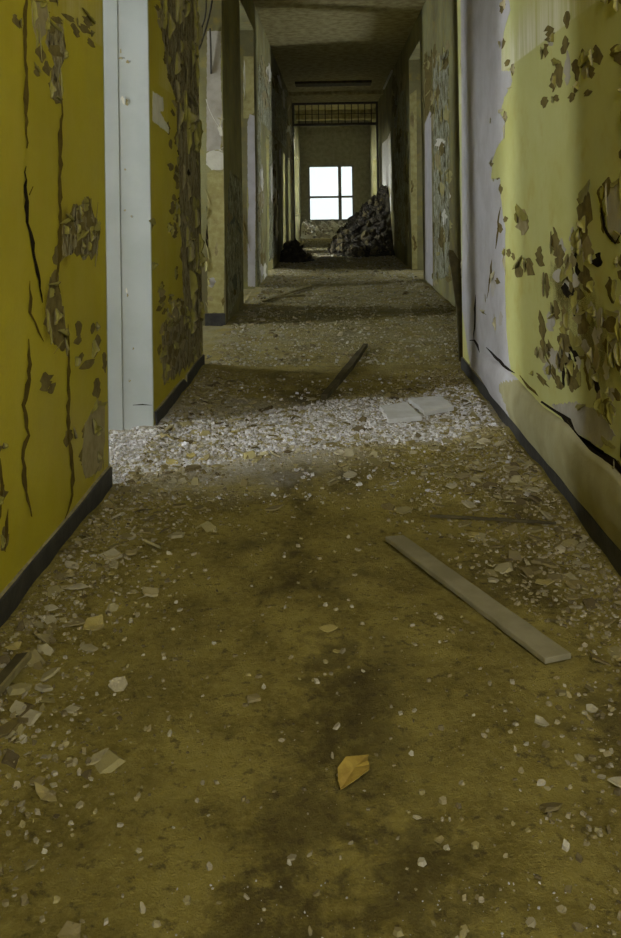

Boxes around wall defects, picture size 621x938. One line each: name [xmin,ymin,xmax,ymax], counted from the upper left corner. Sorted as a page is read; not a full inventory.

flaking render [382,0,621,449]